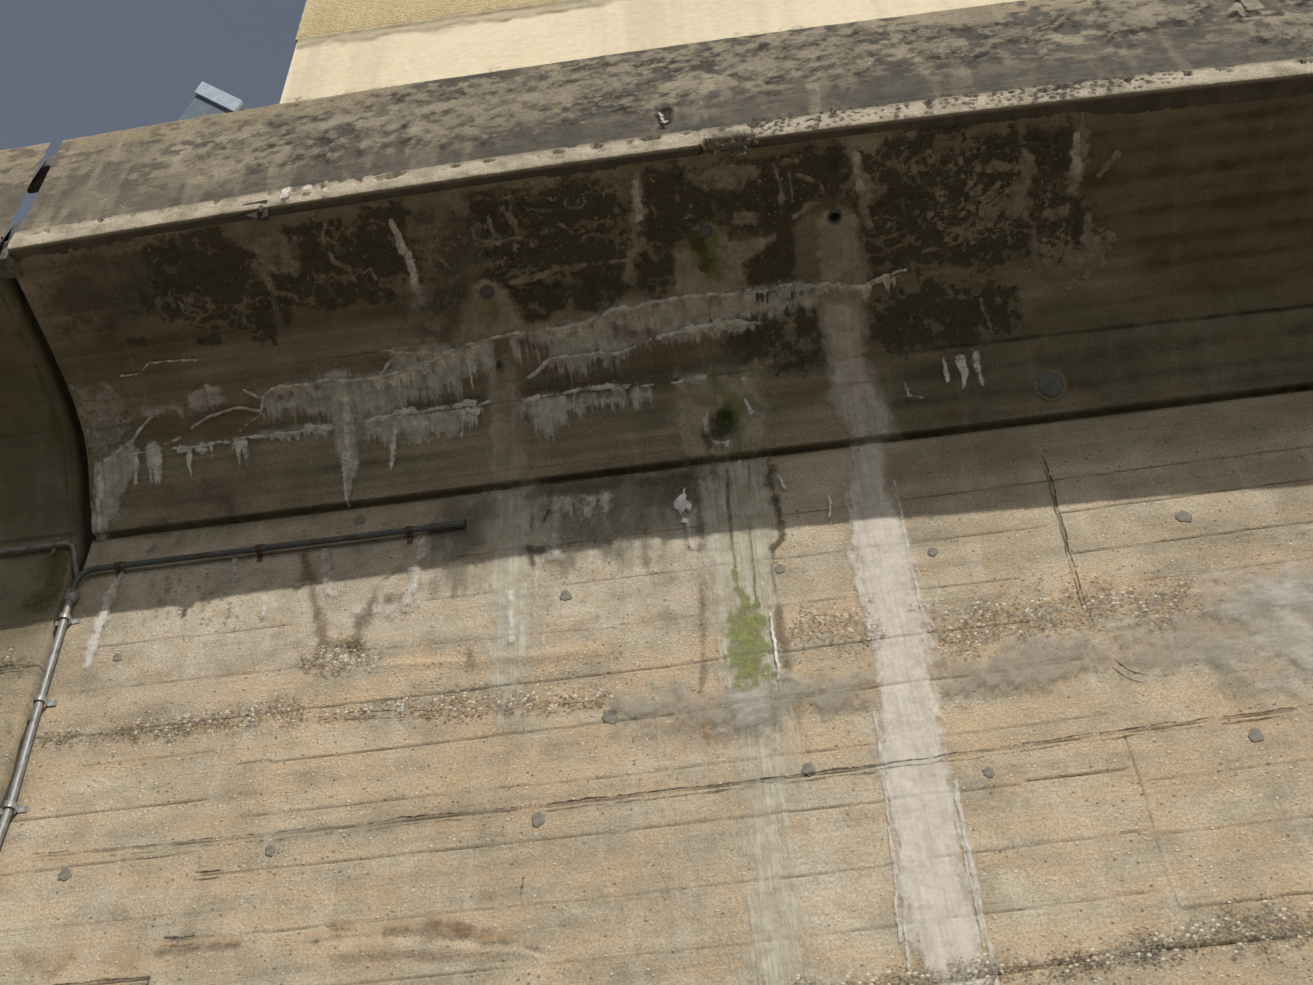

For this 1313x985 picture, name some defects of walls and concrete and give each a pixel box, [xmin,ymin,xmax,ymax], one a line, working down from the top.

leakage [72,146,999,985]
crack [1042,456,1094,623]